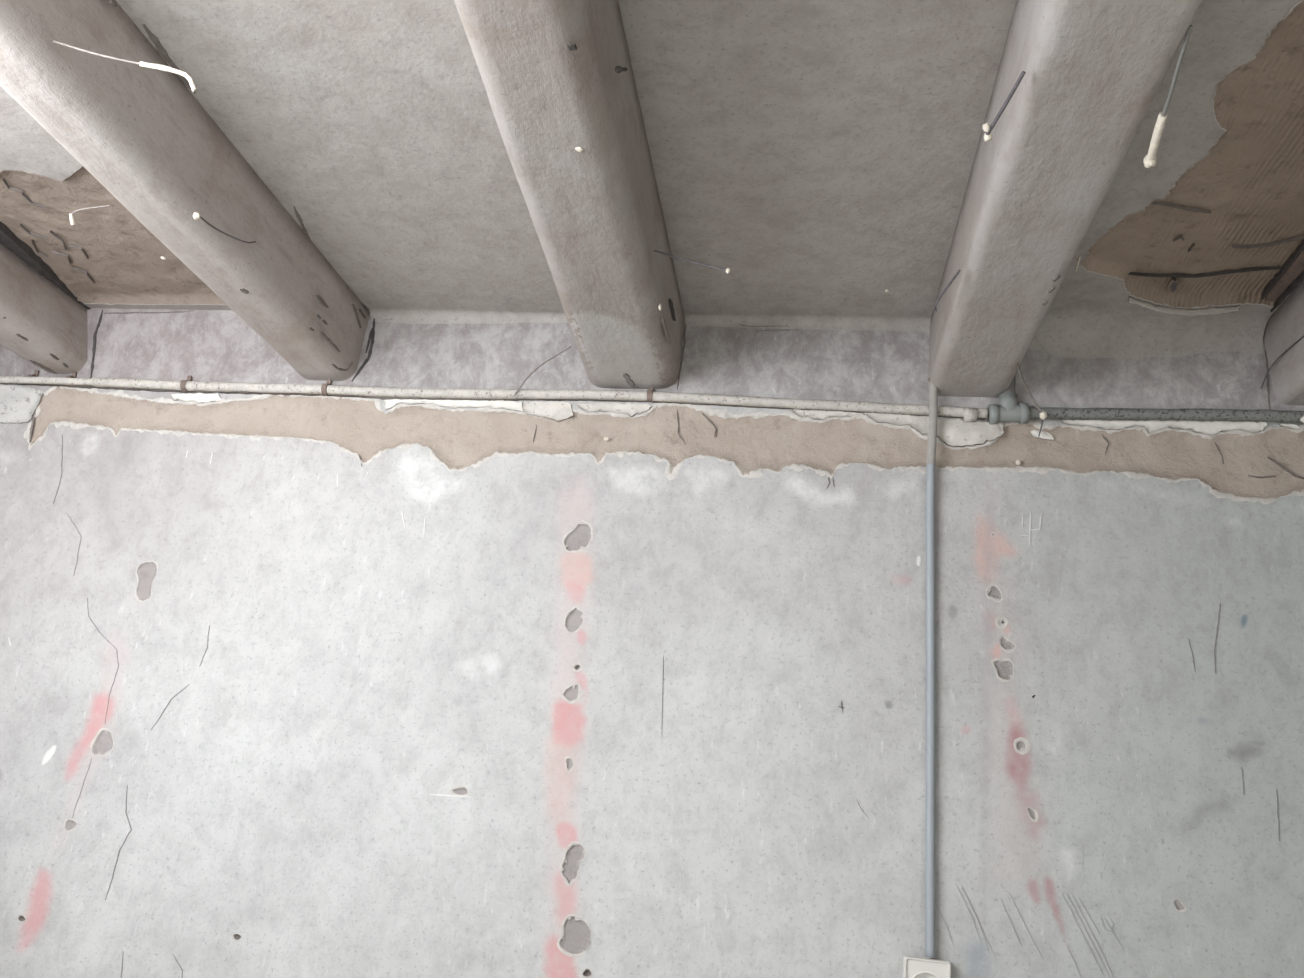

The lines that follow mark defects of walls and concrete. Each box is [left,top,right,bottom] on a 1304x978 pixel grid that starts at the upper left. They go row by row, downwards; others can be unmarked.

flaking render [1080,0,1304,309]
flaking render [0,166,228,306]
spalling [310,295,353,371]
crack [0,178,985,730]
flaking render [24,353,1304,504]
flaking render [563,520,593,553]
flaking render [564,606,585,633]
flaking render [986,583,1017,682]
flaking render [561,682,581,704]
flaking render [1013,737,1031,755]
flaking render [560,841,586,886]
flaking render [557,914,592,978]